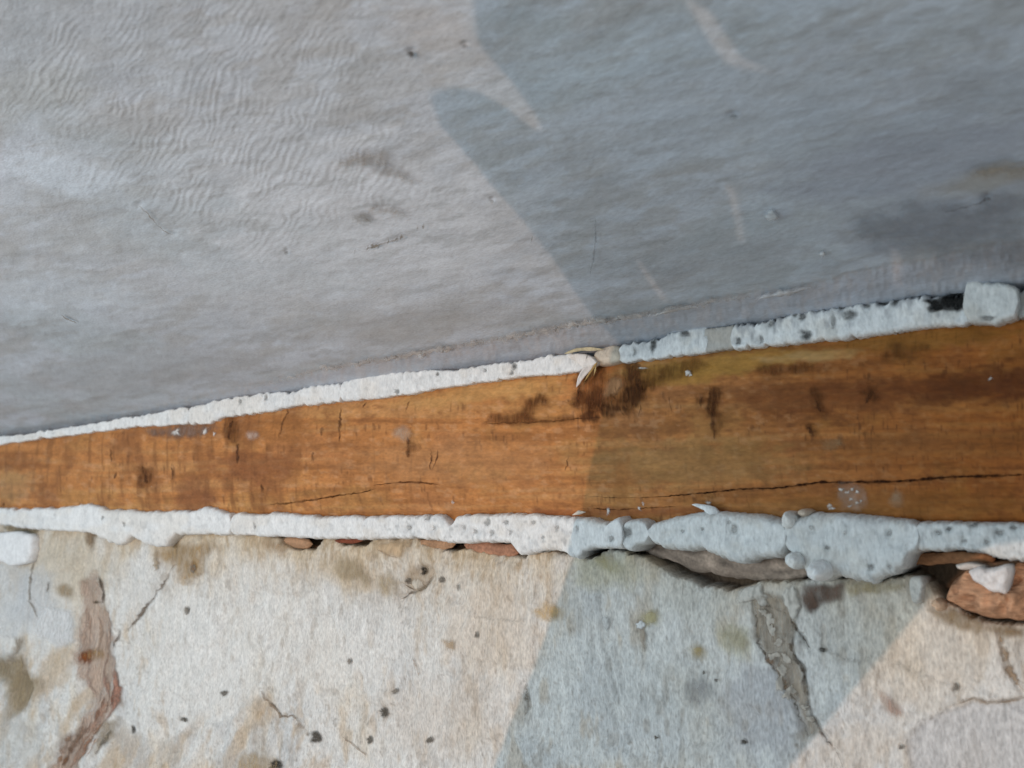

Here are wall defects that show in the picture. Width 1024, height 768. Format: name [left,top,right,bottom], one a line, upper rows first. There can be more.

spalling [52,575,121,768]
crack [113,568,172,647]
spalling [757,596,815,733]